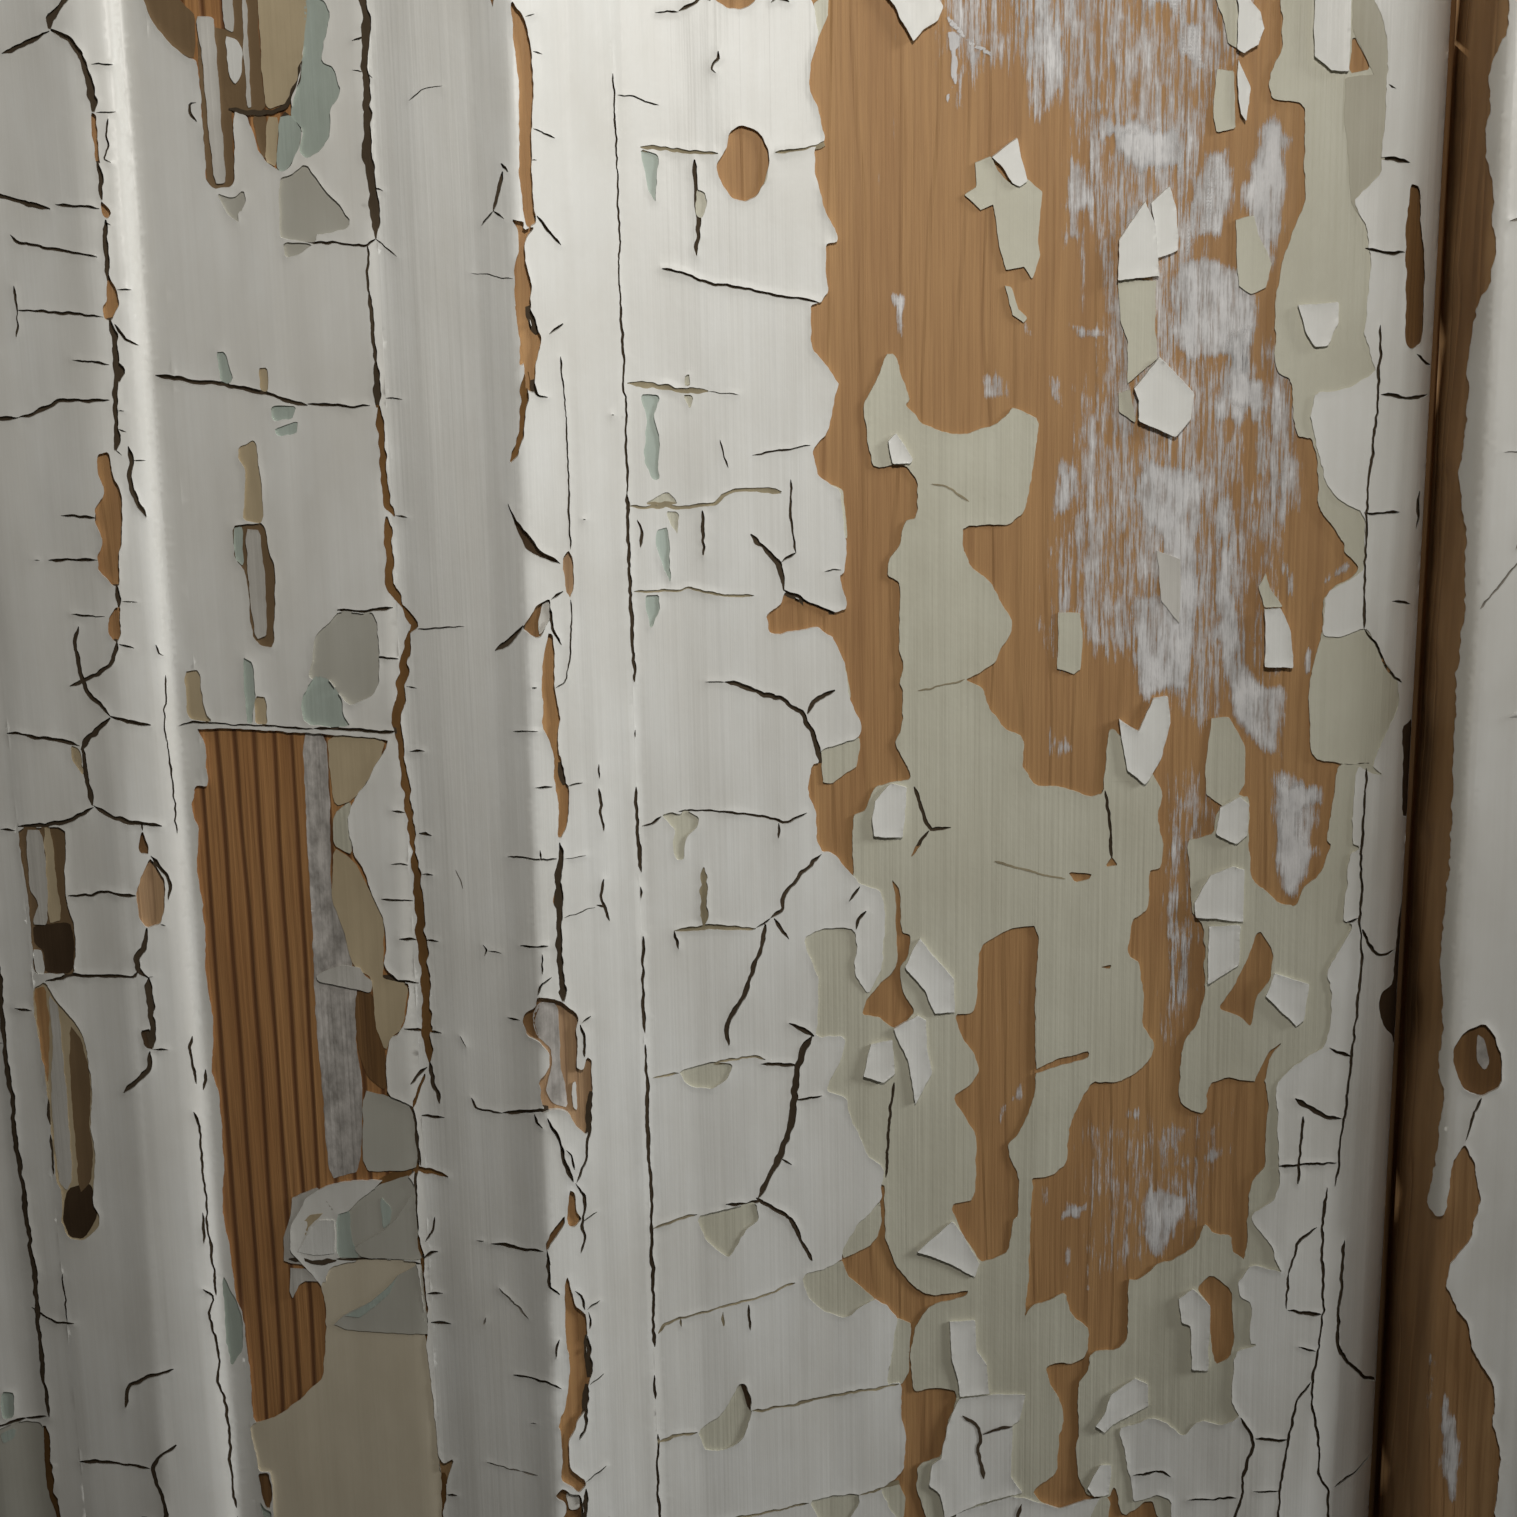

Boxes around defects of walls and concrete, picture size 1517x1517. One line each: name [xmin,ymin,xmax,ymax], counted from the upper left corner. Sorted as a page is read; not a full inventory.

peeling [144,0,349,257]
peeling [717,126,769,201]
peeling [233,440,276,647]
crack [1480,546,1517,609]
crack [0,0,839,1517]
peeling [767,0,1509,1517]
peeling [18,827,99,1240]
peeling [184,611,453,1517]
peeling [523,998,593,1133]
crack [1135,768,1393,1517]
crack [753,1384,898,1412]
crack [860,1480,900,1495]